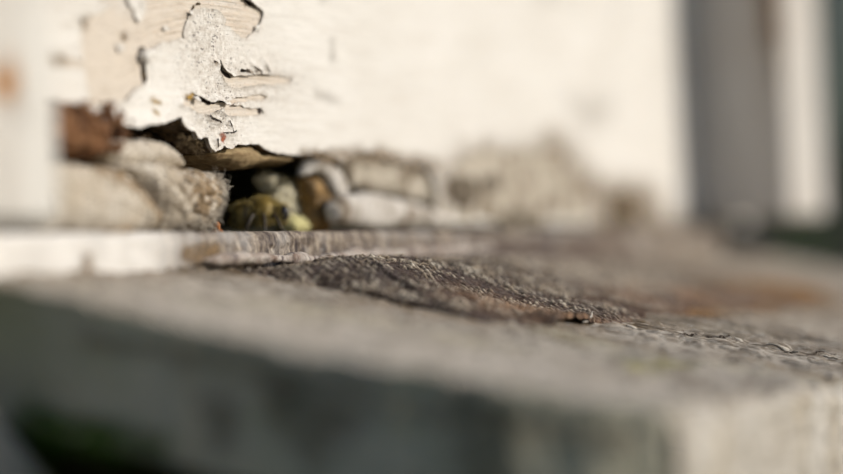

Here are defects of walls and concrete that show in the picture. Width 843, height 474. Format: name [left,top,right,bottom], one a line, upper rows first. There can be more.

peeling [52,0,263,107]
peeling [184,61,291,121]